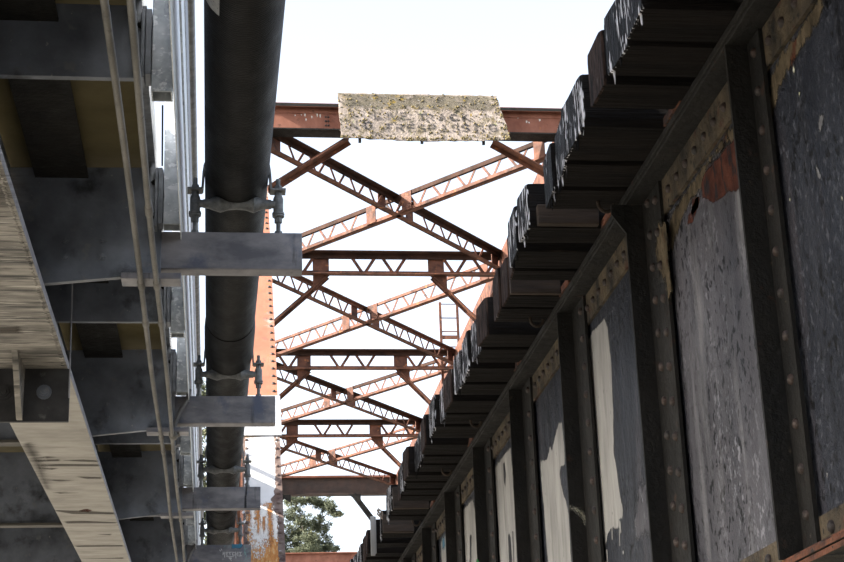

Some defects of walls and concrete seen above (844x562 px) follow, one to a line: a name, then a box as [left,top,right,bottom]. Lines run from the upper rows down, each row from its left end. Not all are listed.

rust [245,503,280,562]
peeling [541,423,571,562]
peeling [589,319,624,562]